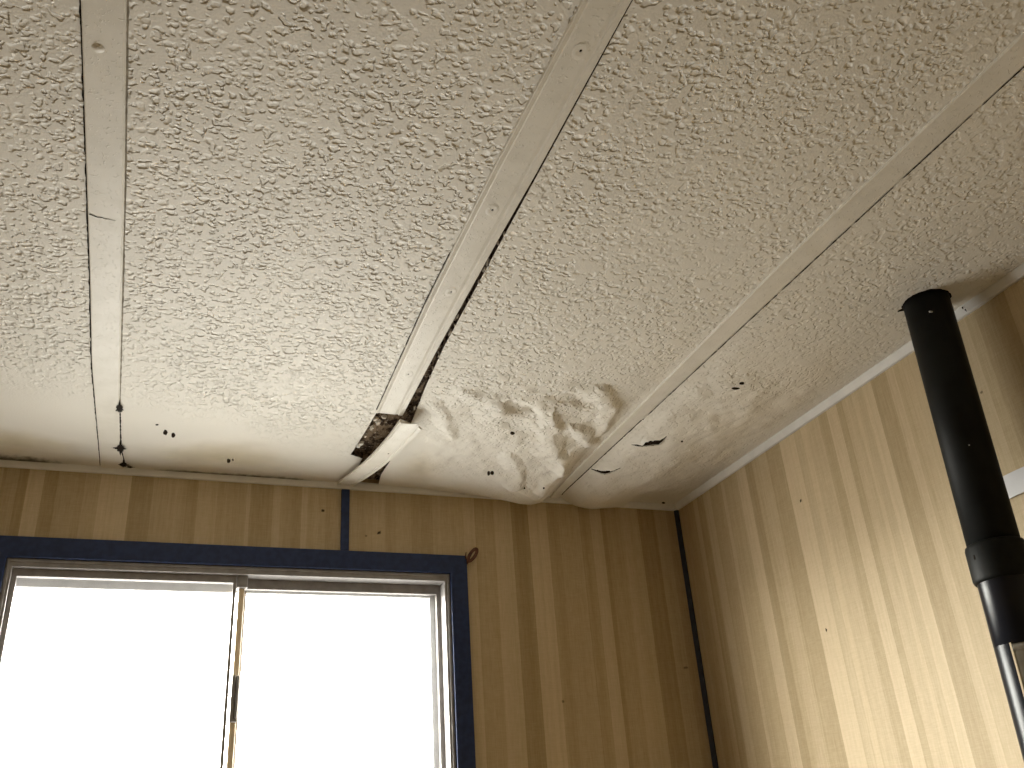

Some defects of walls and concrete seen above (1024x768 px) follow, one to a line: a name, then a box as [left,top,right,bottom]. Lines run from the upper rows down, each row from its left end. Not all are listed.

crack [632,436,667,447]
water stain [113,441,135,468]
crack [591,467,620,475]